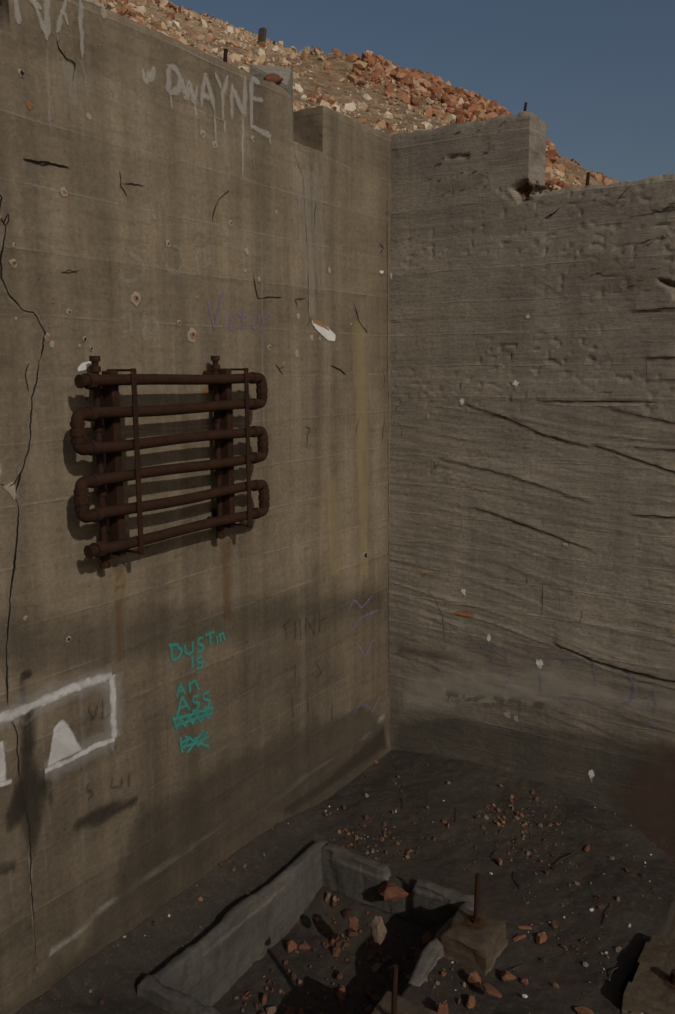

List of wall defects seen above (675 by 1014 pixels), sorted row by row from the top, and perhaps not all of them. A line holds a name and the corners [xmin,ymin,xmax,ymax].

crack [24,158,69,168]
peeling [310,319,336,341]
crack [543,338,675,423]
crack [476,407,675,477]
crack [0,194,46,980]
crack [557,646,675,684]